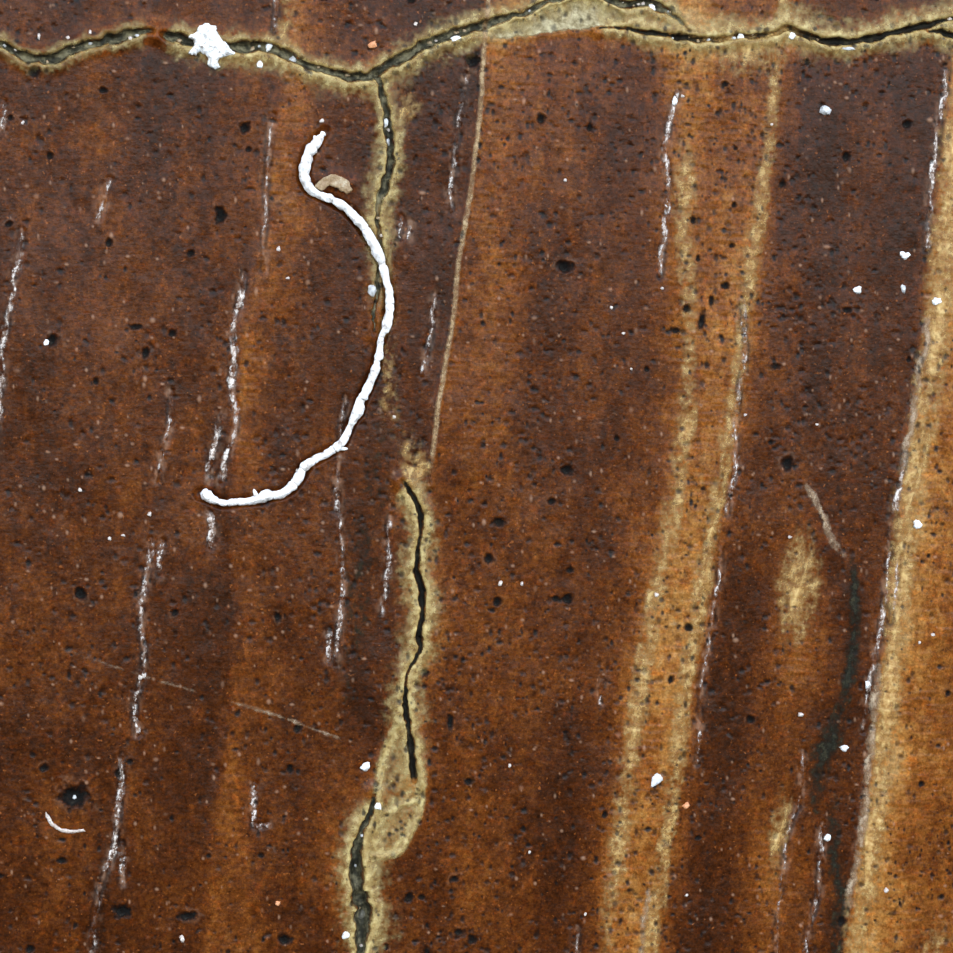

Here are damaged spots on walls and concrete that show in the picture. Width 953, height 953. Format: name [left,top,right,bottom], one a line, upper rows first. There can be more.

crack [0,0,953,455]
crack [342,481,436,953]